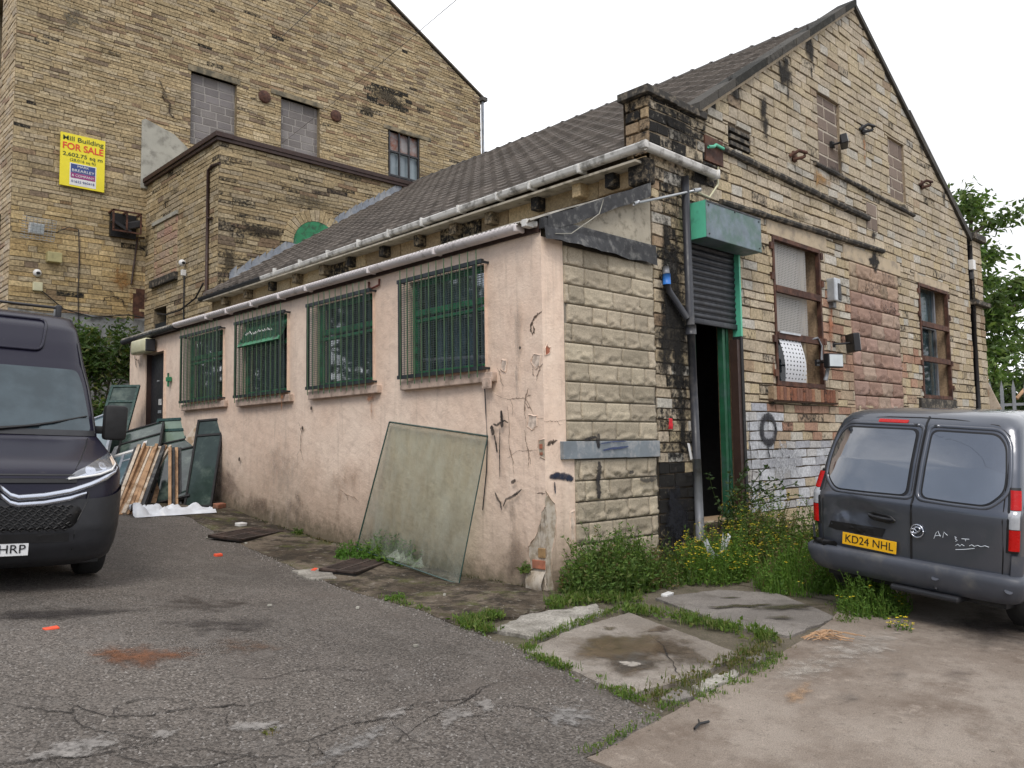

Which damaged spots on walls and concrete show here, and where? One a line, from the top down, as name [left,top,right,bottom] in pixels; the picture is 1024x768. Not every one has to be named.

crack [497,363,566,472]
damp [678,397,686,453]
spalling [525,492,557,591]